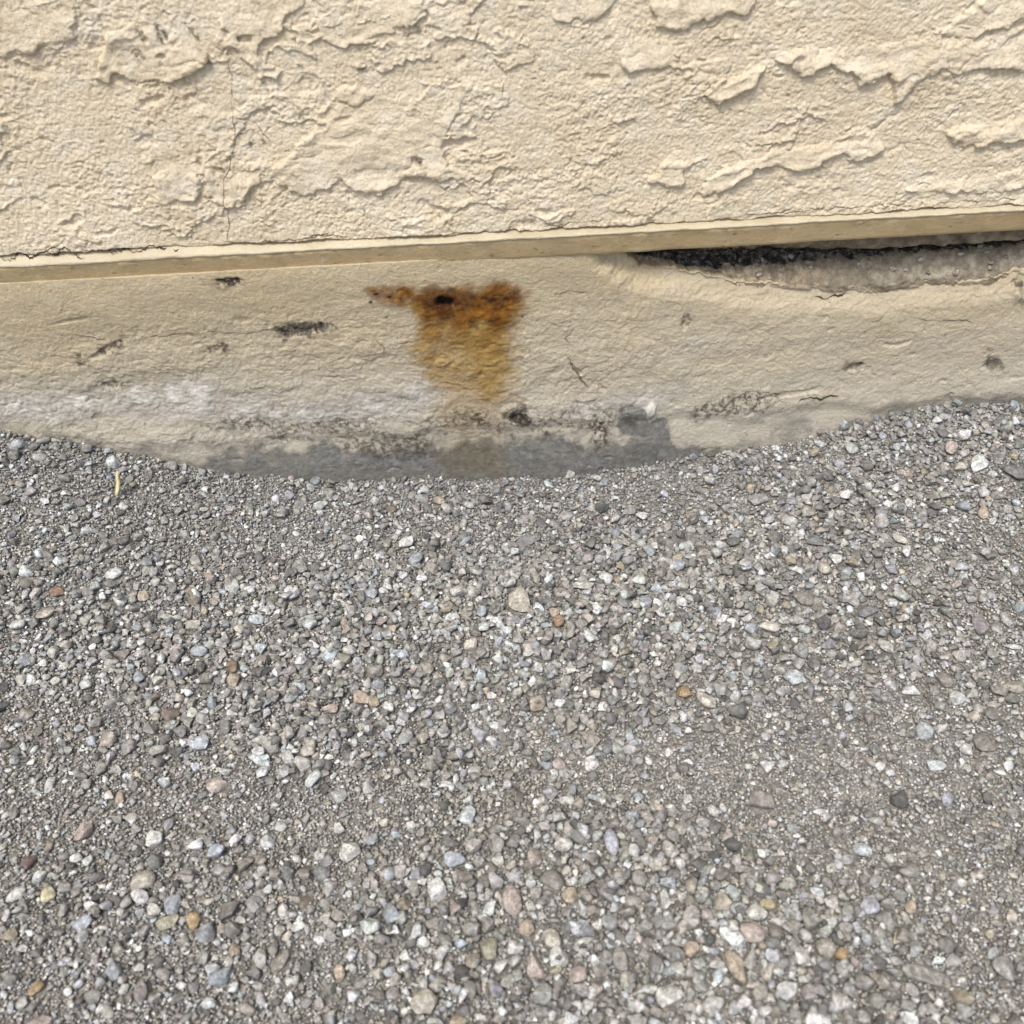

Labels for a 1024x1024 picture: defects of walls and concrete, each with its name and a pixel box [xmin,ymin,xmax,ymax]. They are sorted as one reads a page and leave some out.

spalling [628,230,1024,300]
peeling [274,321,337,341]
corrosion [368,282,523,389]
water stain [199,433,720,483]